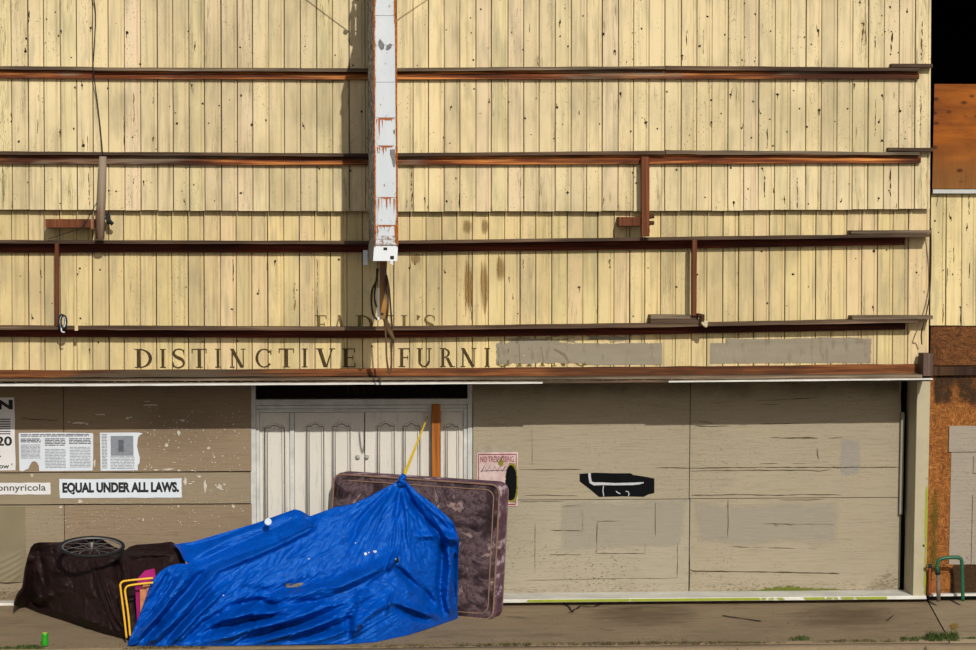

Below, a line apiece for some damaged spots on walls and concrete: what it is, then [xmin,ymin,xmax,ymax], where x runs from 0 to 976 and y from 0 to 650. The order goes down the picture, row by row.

rust [375,110,398,180]
rust [377,187,397,246]